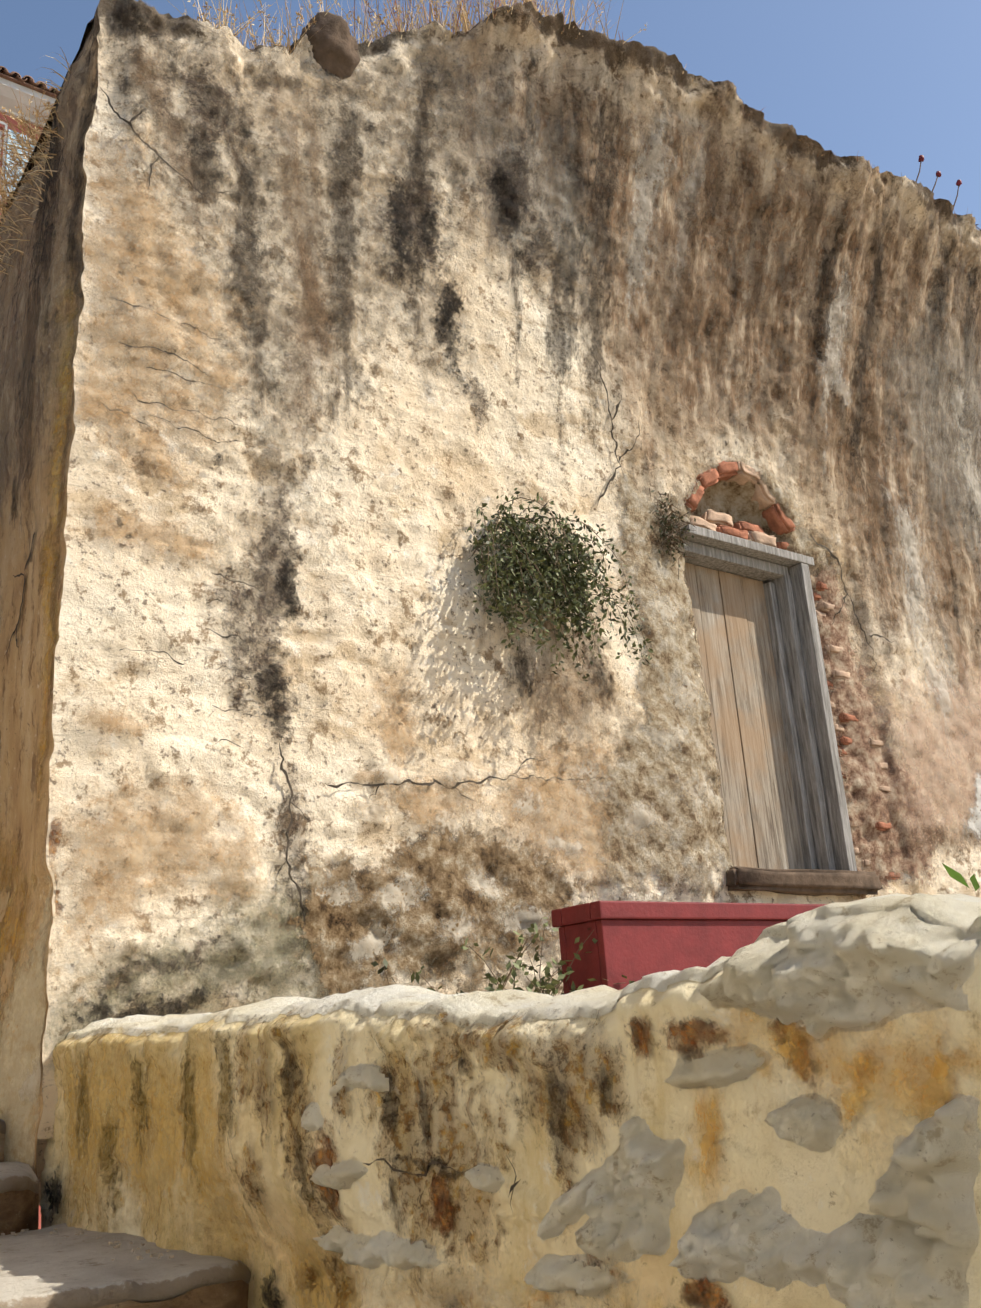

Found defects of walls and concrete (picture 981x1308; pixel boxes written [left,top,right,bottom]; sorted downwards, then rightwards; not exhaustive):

leakage [0,3,981,847]
crack [119,649,186,665]
leakage [52,771,267,943]
crack [206,572,265,748]
leakage [269,764,313,914]
crack [274,743,310,961]
crack [325,758,618,802]
spalling [274,452,949,998]